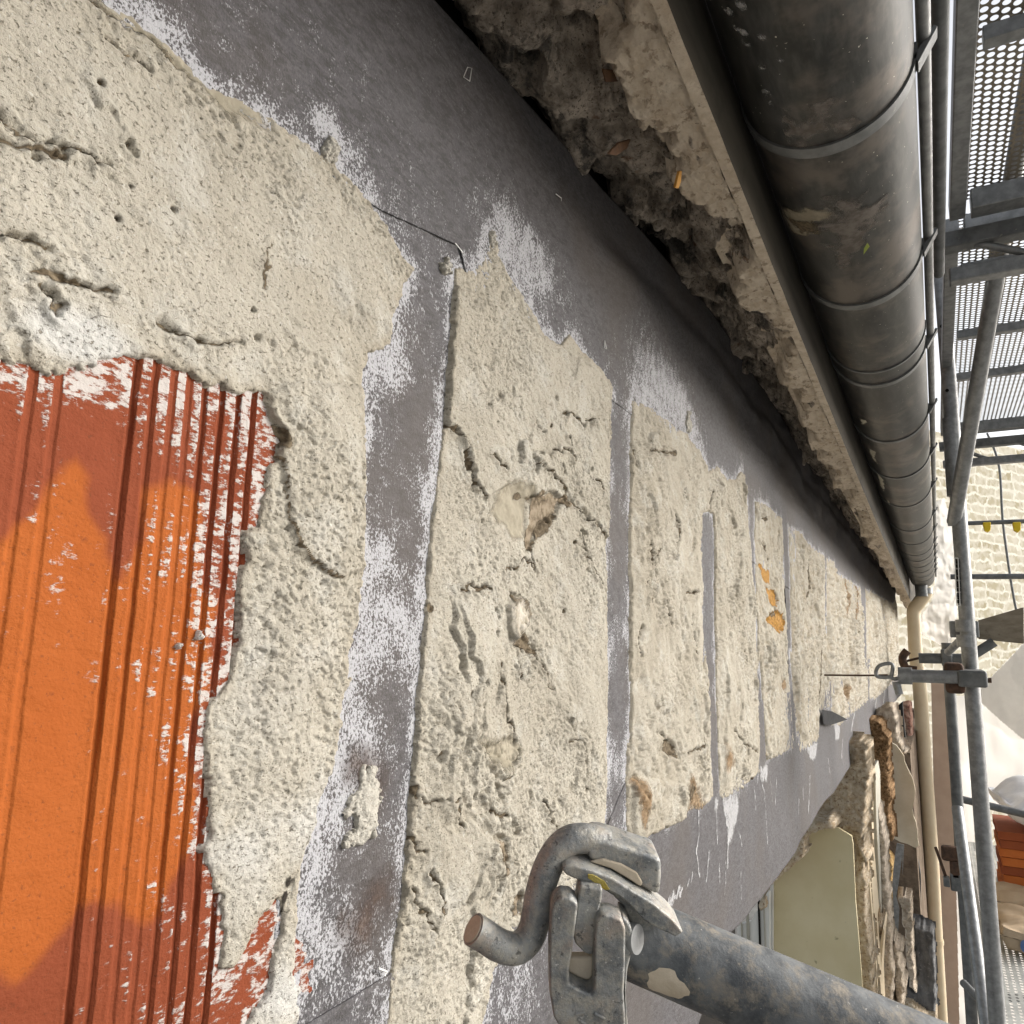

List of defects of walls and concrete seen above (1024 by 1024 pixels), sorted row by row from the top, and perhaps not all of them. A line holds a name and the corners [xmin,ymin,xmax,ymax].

crack [0,119,104,164]
crack [8,235,114,315]
spalling [512,489,572,550]